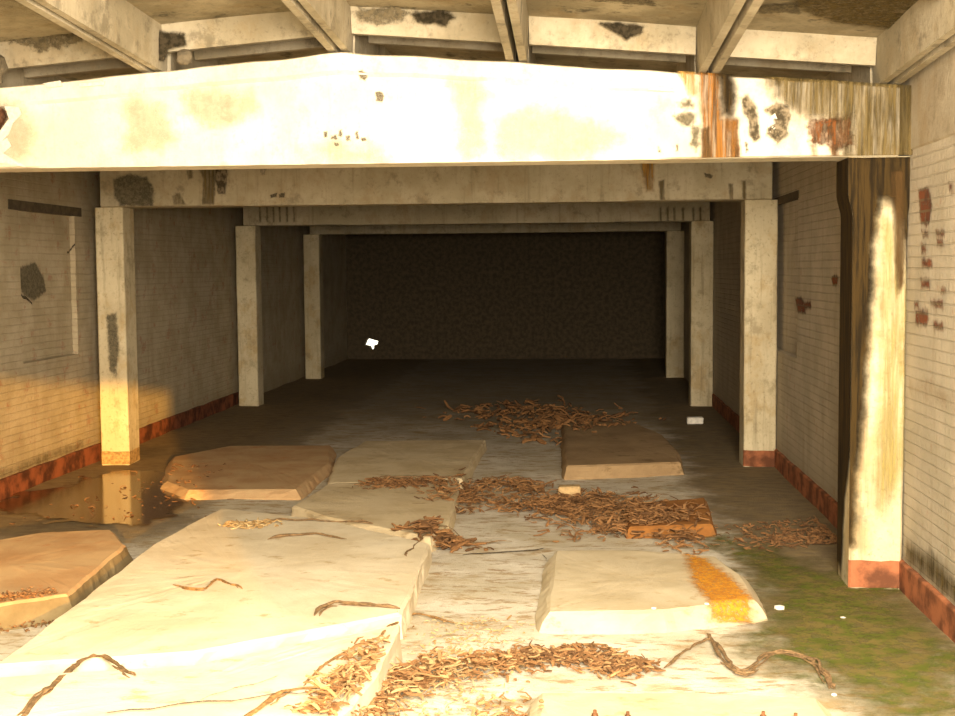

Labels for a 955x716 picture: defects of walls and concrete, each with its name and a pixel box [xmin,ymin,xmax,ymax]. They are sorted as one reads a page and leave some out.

flaking render [600,22,644,40]
spalling [0,54,8,84]
rust [679,71,739,158]
spalling [742,95,791,143]
flaking render [20,263,46,300]
peeling [915,187,946,329]
water stain [765,76,913,571]